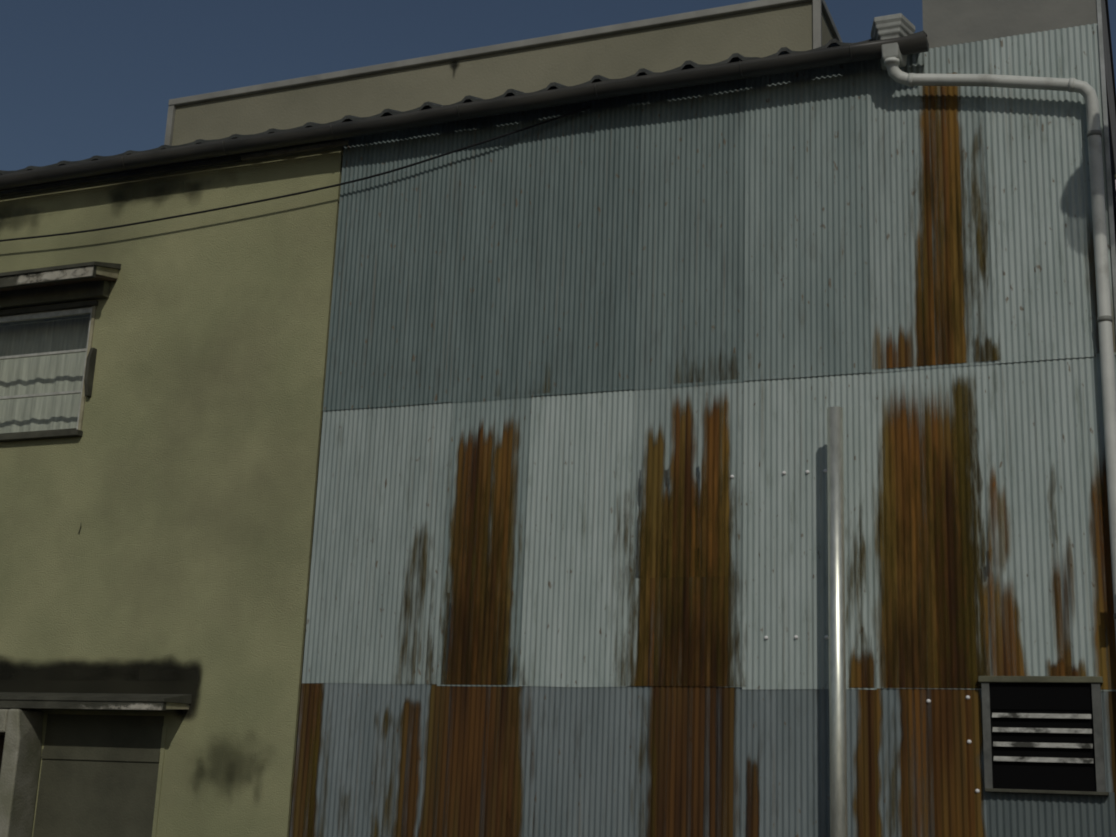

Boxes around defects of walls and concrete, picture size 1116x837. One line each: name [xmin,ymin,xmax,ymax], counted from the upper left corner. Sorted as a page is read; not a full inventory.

rust [877,72,1000,369]
rust [291,683,327,837]
rust [372,422,534,837]
rust [618,397,759,837]
rust [849,380,1026,837]